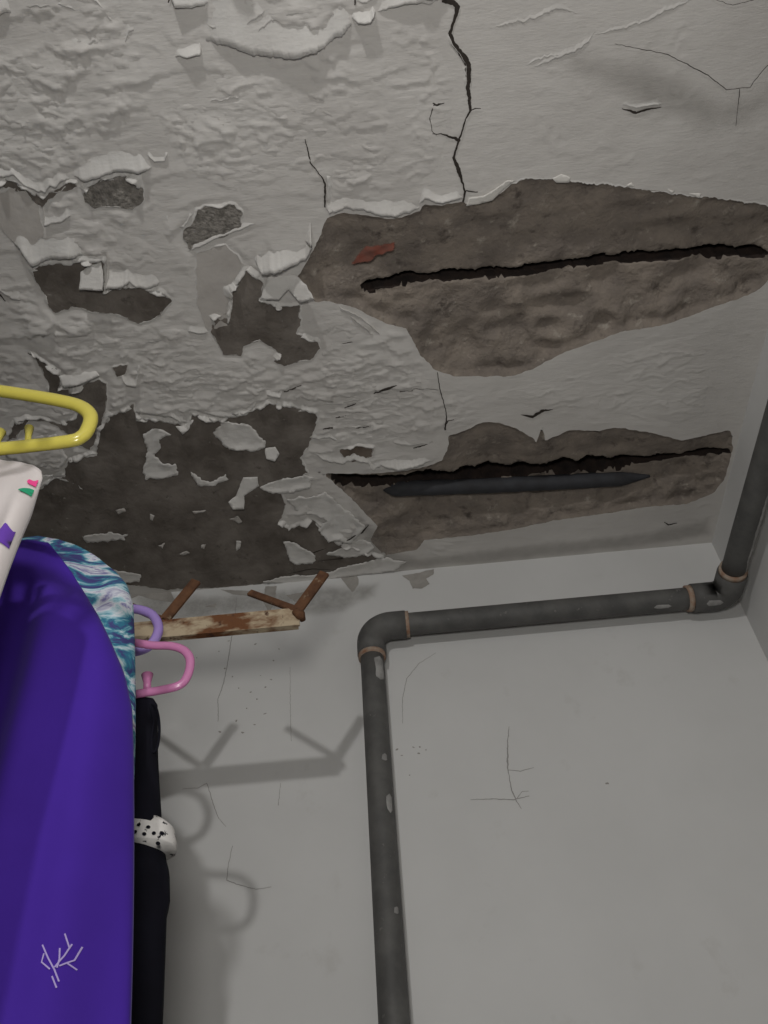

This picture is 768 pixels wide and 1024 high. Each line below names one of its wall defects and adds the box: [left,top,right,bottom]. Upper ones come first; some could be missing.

peeling [171,0,438,59]
crack [429,0,481,202]
peeling [0,151,174,325]
spalling [180,174,768,377]
peeling [1,351,733,611]